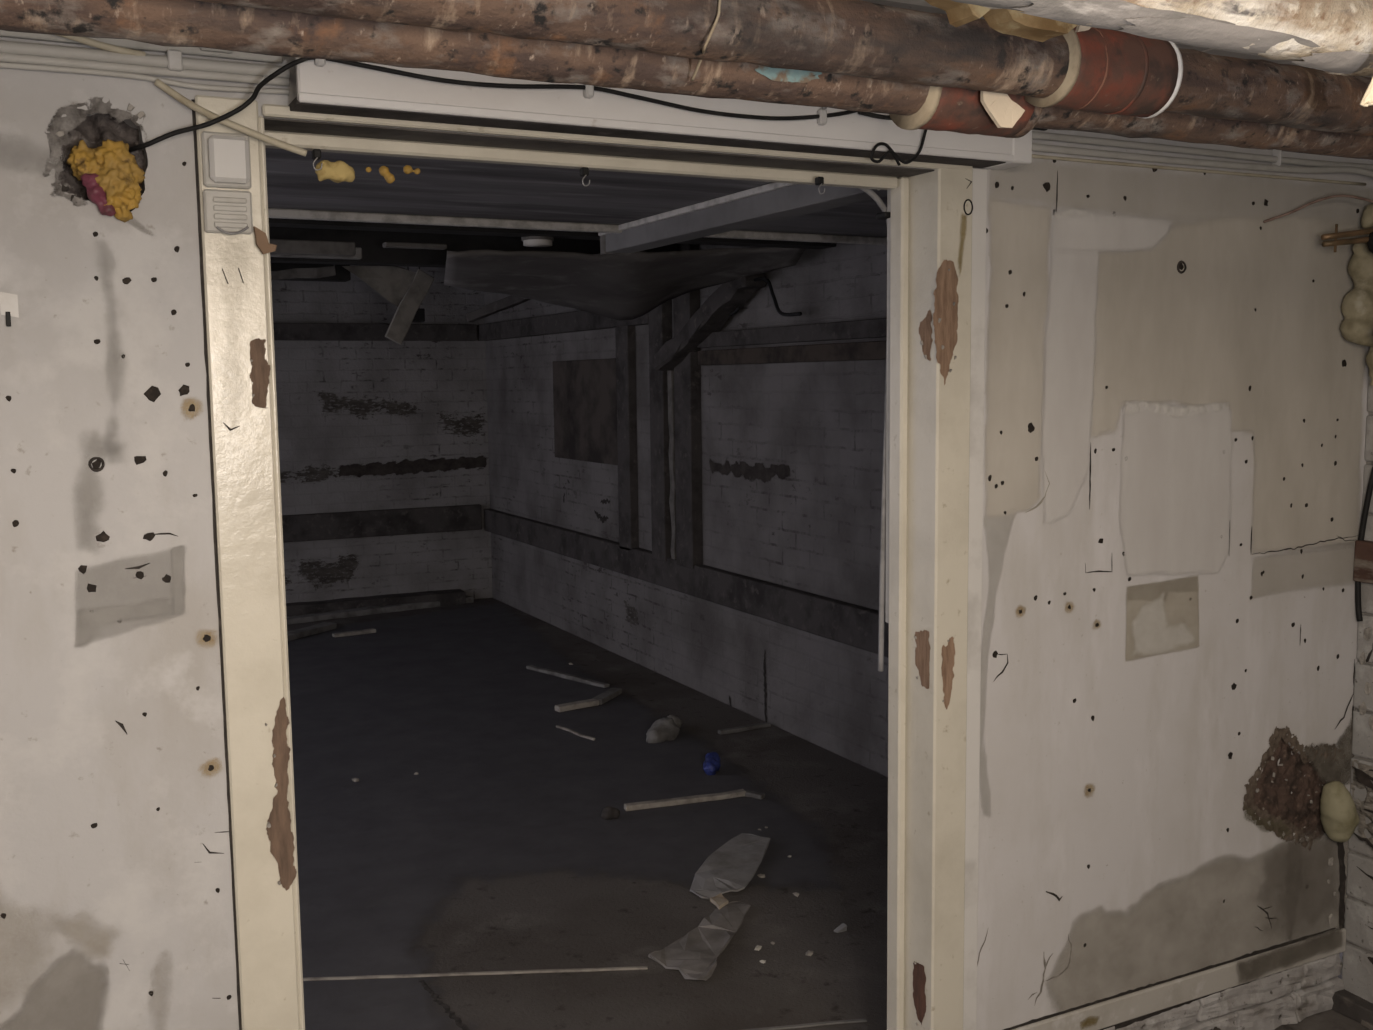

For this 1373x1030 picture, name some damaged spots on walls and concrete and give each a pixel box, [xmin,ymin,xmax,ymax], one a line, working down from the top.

spalling [43,97,149,212]
peeling [919,260,959,385]
peeling [914,630,955,710]
peeling [265,697,297,891]
spalling [1243,709,1373,851]
leakage [0,883,126,1030]
peeling [913,961,926,1025]
leakage [1045,822,1350,1013]